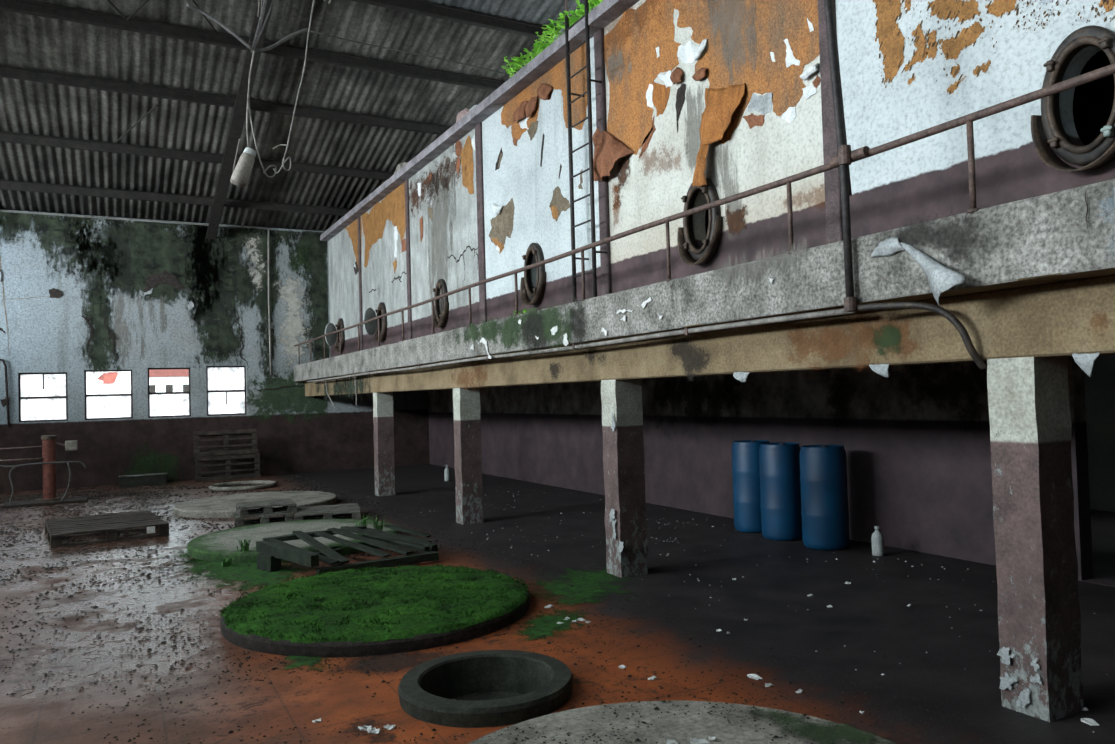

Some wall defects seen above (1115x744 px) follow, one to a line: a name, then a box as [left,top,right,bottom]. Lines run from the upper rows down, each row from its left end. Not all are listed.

peeling [873,0,1069,95]
peeling [1072,0,1115,26]
peeling [495,0,821,189]
peeling [345,172,433,275]
flaking render [489,198,515,254]
flaking render [549,164,570,222]
leakage [114,295,167,365]
leakage [246,234,309,366]
leakage [521,309,546,353]
peeling [997,647,1042,708]